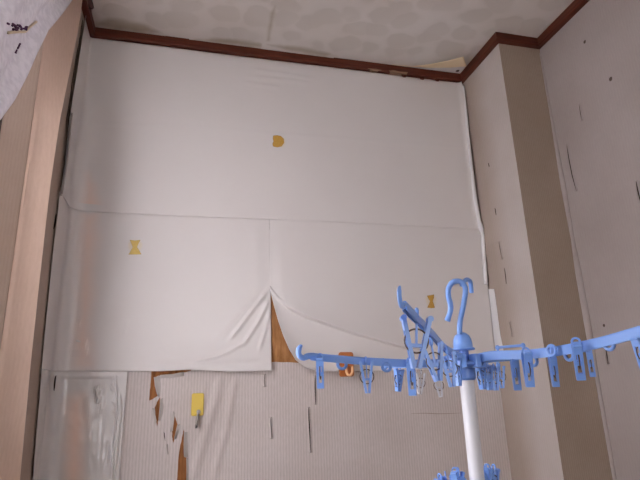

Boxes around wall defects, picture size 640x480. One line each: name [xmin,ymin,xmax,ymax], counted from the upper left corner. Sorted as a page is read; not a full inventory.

peeling [271,296,299,363]